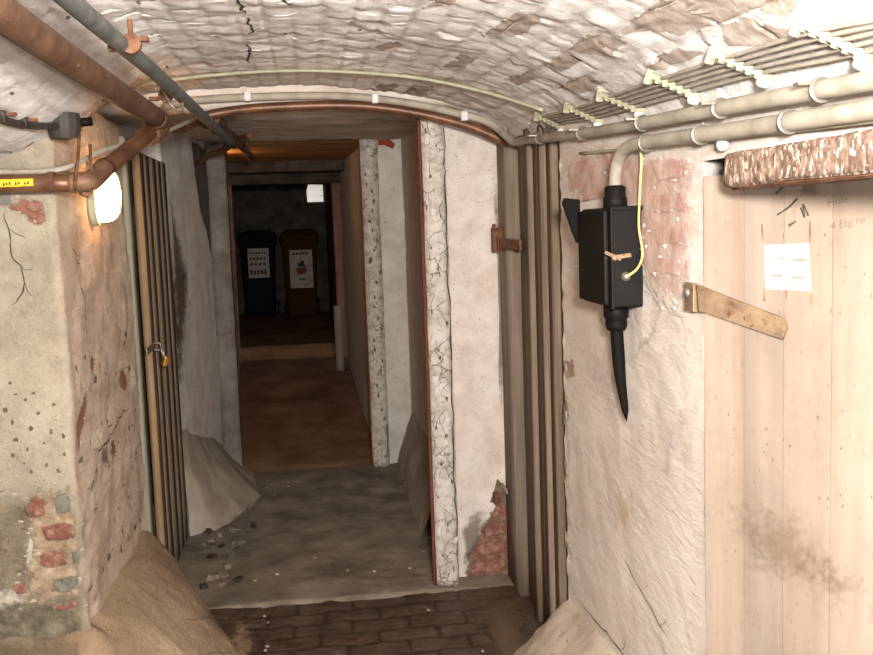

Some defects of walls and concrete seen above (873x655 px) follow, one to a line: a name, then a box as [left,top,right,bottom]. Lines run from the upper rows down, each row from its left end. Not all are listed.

crack [234,0,265,64]
peeling [482,13,542,37]
peeling [505,0,797,86]
peeling [372,84,434,95]
crack [3,214,32,306]
flaking render [0,193,53,225]
leakage [171,212,187,368]
peeling [567,154,613,202]
peeling [621,148,697,311]
flaking render [421,120,508,577]
crack [95,408,129,466]
flaking render [0,463,97,610]